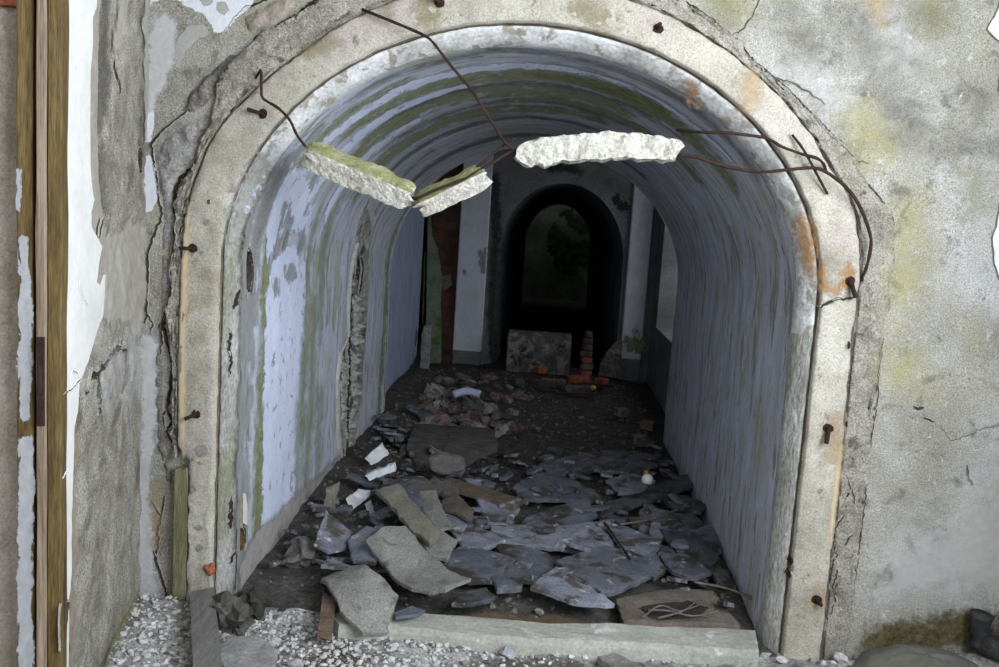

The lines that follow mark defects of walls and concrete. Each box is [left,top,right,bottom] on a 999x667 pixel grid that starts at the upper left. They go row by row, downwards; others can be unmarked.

peeling [150,0,299,41]
crack [221,0,318,55]
crack [64,110,210,459]
spalling [136,13,248,306]
peeling [224,123,328,590]
damp [324,185,344,226]
damp [378,202,413,414]
damp [486,173,502,360]
damp [316,50,741,194]
crack [677,0,895,285]
corrosion [796,214,855,295]
crack [816,296,854,309]